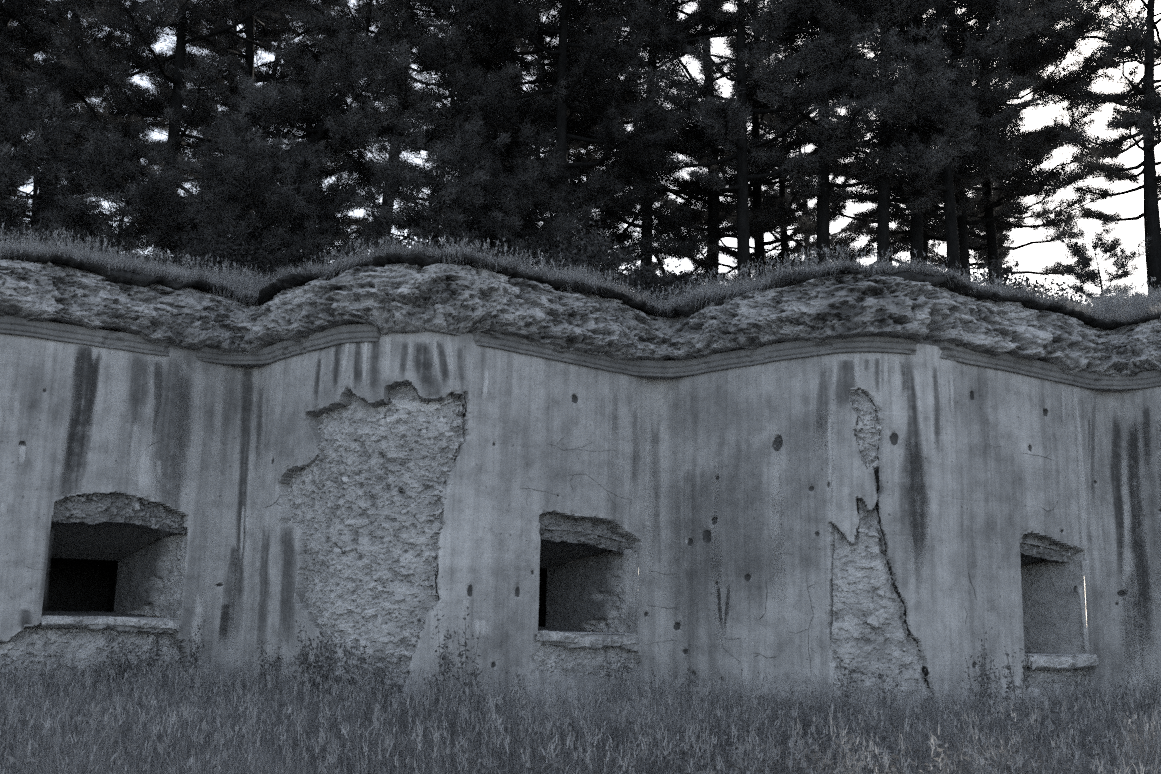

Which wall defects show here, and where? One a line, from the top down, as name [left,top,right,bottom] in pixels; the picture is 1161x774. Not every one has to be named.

spalling [0,255,1161,377]
leakage [64,348,99,483]
leakage [130,367,185,495]
spalling [772,435,782,451]
spalling [850,389,898,469]
spalling [0,626,186,681]
spalling [51,493,187,534]
spalling [286,386,465,696]
spalling [539,513,636,555]
spalling [830,501,931,712]
crack [831,395,934,698]
leakage [1112,412,1150,619]